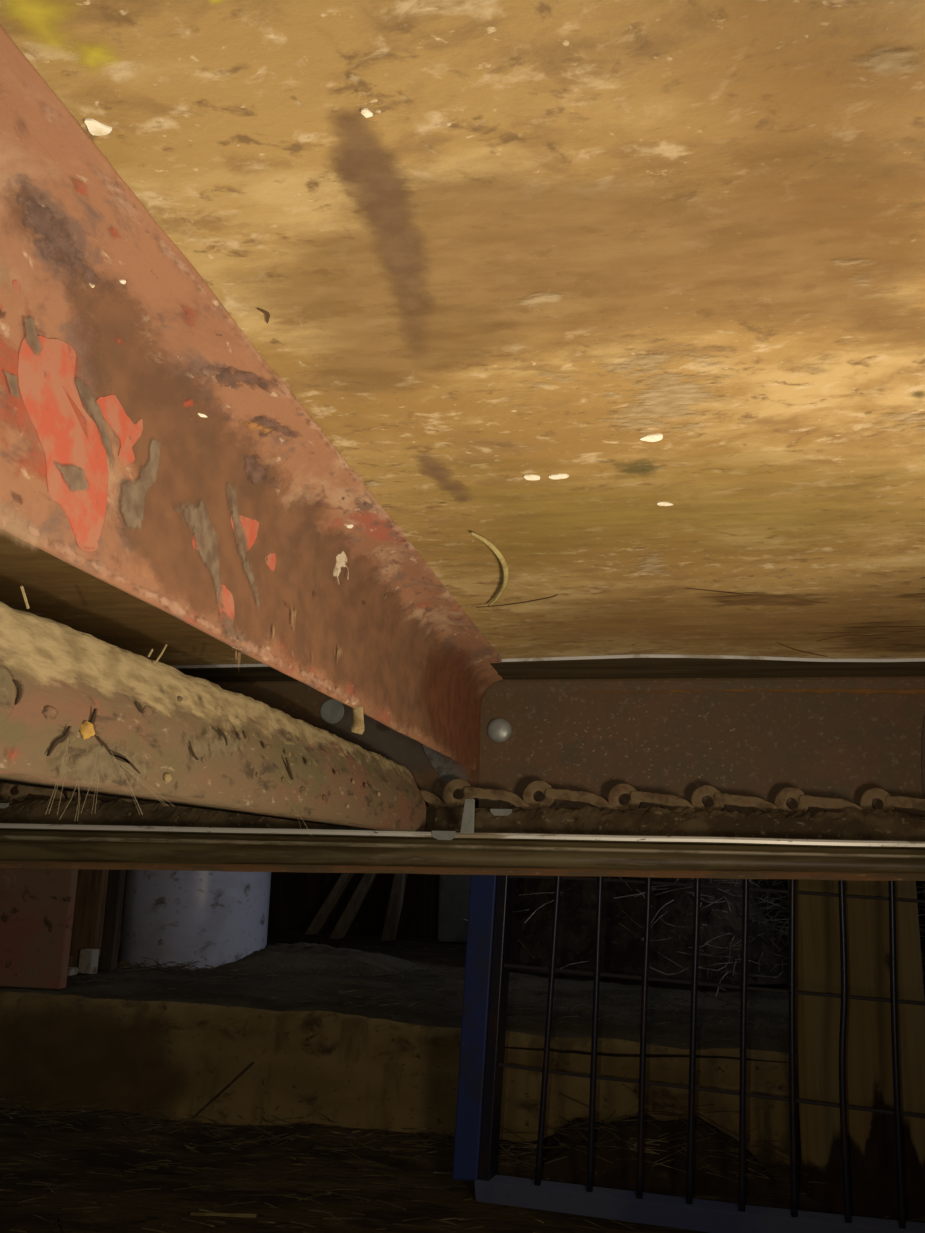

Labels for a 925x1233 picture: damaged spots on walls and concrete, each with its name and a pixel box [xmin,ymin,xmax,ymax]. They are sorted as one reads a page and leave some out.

water stain [275,116,925,377]
rust [25,318,42,355]
rust [4,371,20,399]
peeling [202,367,279,392]
peeling [0,336,143,551]
rust [57,463,88,491]
peeling [231,514,259,551]
rust [73,281,484,776]
peeling [265,553,276,571]
peeling [216,584,235,629]